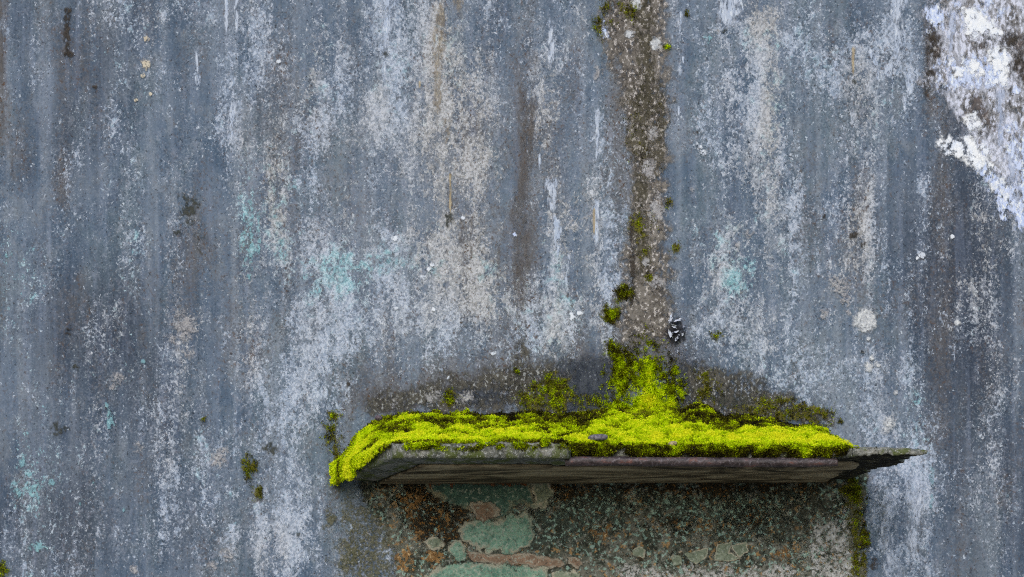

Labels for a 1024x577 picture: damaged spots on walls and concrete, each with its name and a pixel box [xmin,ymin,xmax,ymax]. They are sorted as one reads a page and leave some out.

damp [719,0,744,27]
damp [869,0,907,80]
damp [903,26,942,111]
damp [1000,32,1024,83]
damp [594,0,684,346]
damp [545,178,570,285]
peeling [423,483,583,577]
peeling [627,545,646,561]
peeling [671,542,749,566]